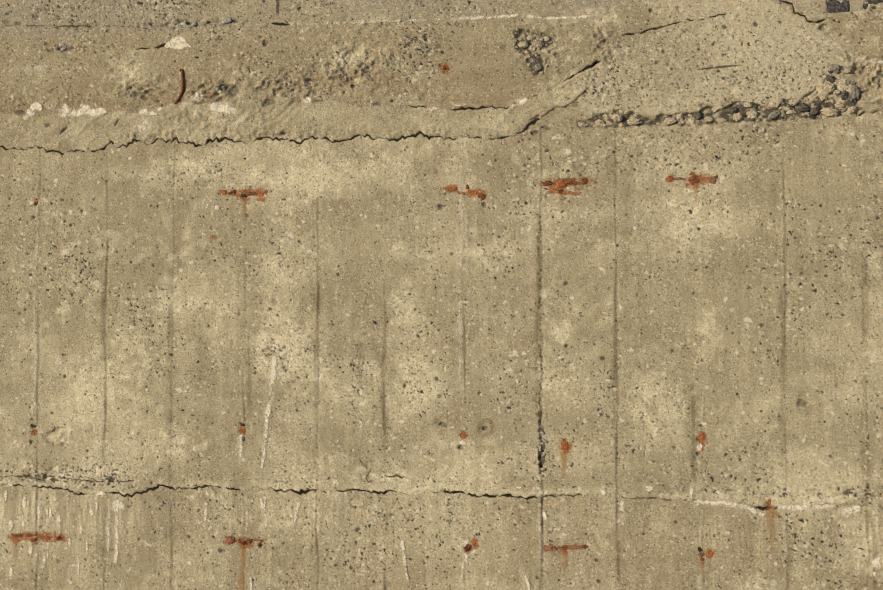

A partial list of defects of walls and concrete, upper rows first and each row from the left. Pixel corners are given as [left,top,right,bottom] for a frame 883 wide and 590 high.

crack [779,0,825,23]
crack [622,13,726,36]
crack [8,25,166,50]
spalling [577,0,883,121]
crack [564,61,601,108]
crack [453,102,516,110]
crack [0,118,539,155]
crack [5,474,240,498]
crack [273,460,404,495]
crack [434,491,581,530]
rust [11,532,67,547]